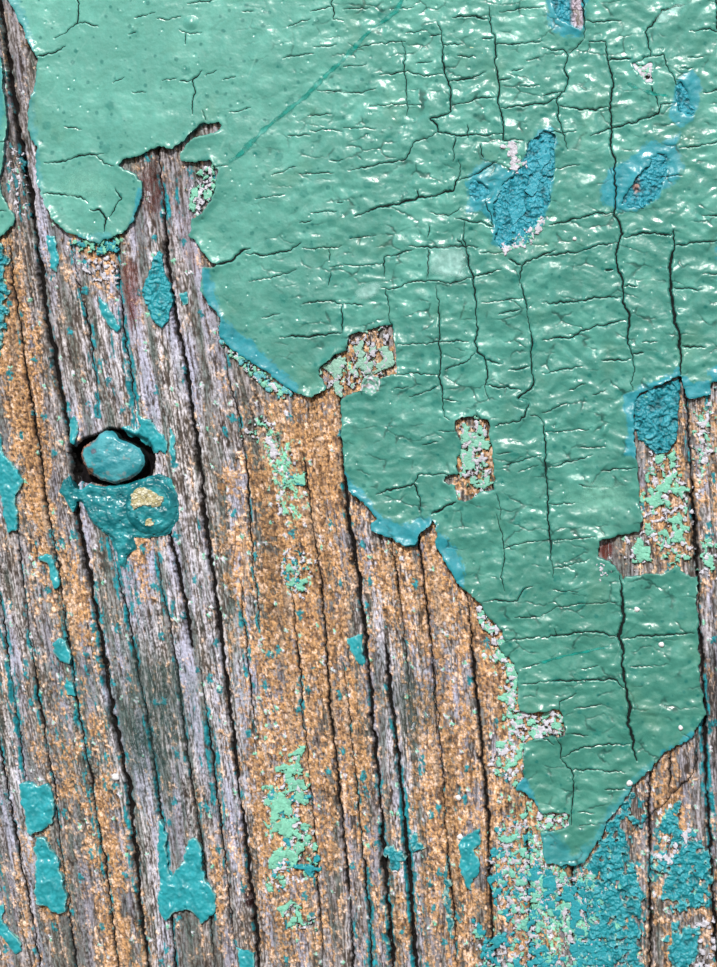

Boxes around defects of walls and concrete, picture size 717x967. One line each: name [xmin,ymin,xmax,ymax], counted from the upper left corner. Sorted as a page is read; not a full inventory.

crack [131,0,212,44]
crack [114,70,236,119]
crack [0,0,165,967]
crack [158,147,261,967]
crack [216,0,717,967]
peeling [458,415,496,495]
peeling [621,399,717,580]
peeling [476,605,564,787]
peeling [19,780,69,914]
peeling [157,819,217,924]
peeling [261,745,322,892]
peeling [458,808,610,967]